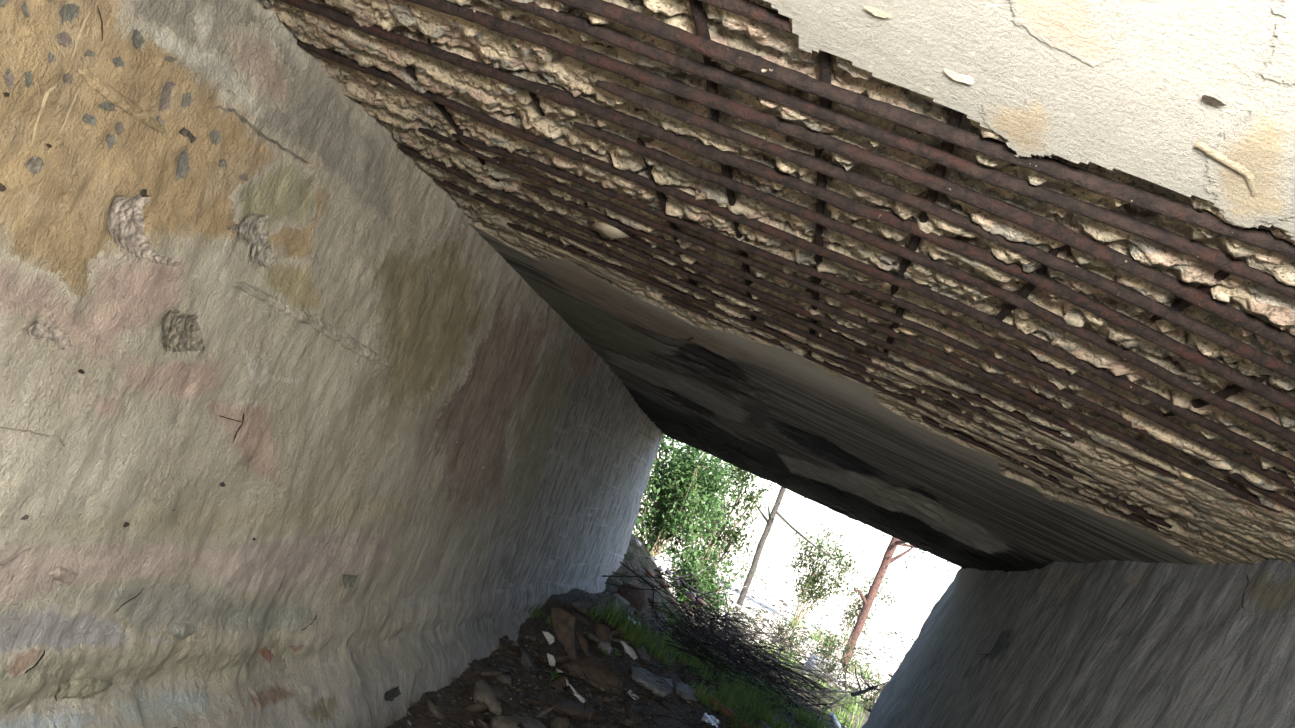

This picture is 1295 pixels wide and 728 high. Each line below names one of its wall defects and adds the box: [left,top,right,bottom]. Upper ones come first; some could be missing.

spalling [107,189,180,266]
spalling [227,213,276,268]
spalling [255,0,1295,565]
spalling [161,308,205,352]
water stain [0,0,777,728]
crack [0,427,65,447]